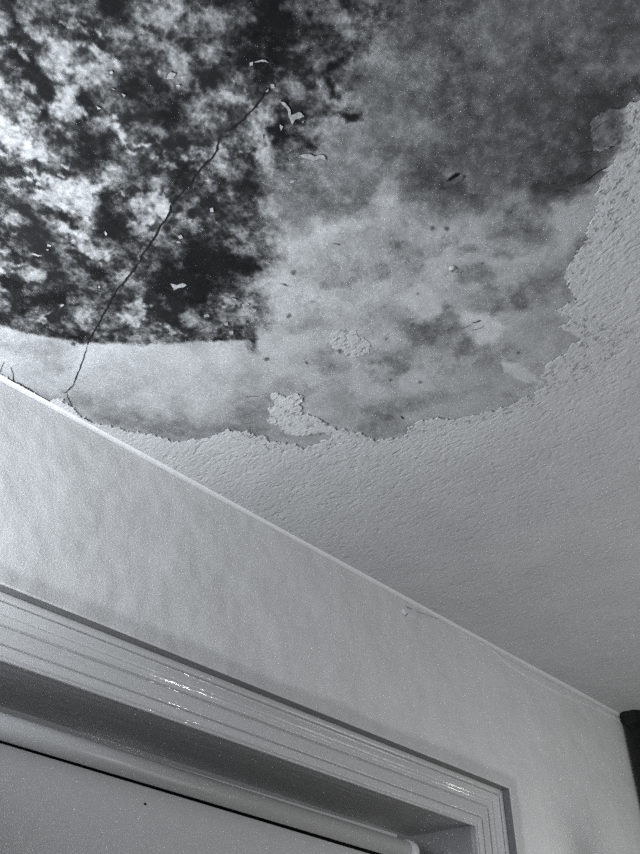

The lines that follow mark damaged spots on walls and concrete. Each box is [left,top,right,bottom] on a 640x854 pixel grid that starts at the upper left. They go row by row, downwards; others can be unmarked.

crack [65,82,274,406]
water stain [0,0,402,345]
peeling [0,0,640,453]
water stain [426,82,640,207]